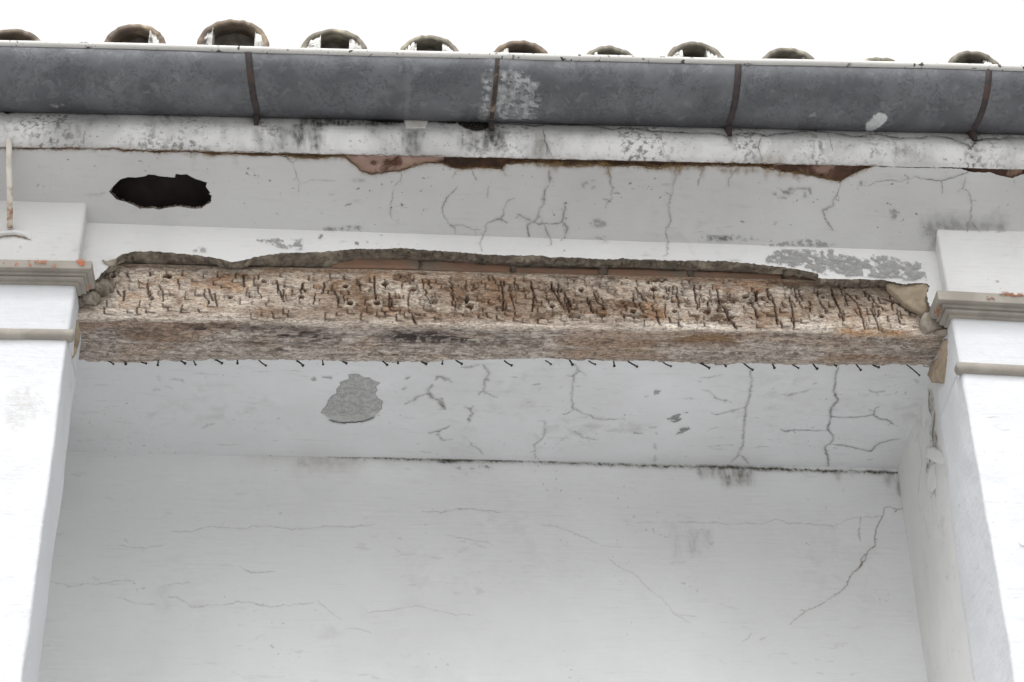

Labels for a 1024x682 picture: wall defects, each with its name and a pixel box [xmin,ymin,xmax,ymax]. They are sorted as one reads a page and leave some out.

spalling [112,174,212,208]
spalling [121,149,889,181]
crack [18,124,1014,244]
spalling [88,238,948,384]
peeling [320,374,383,424]